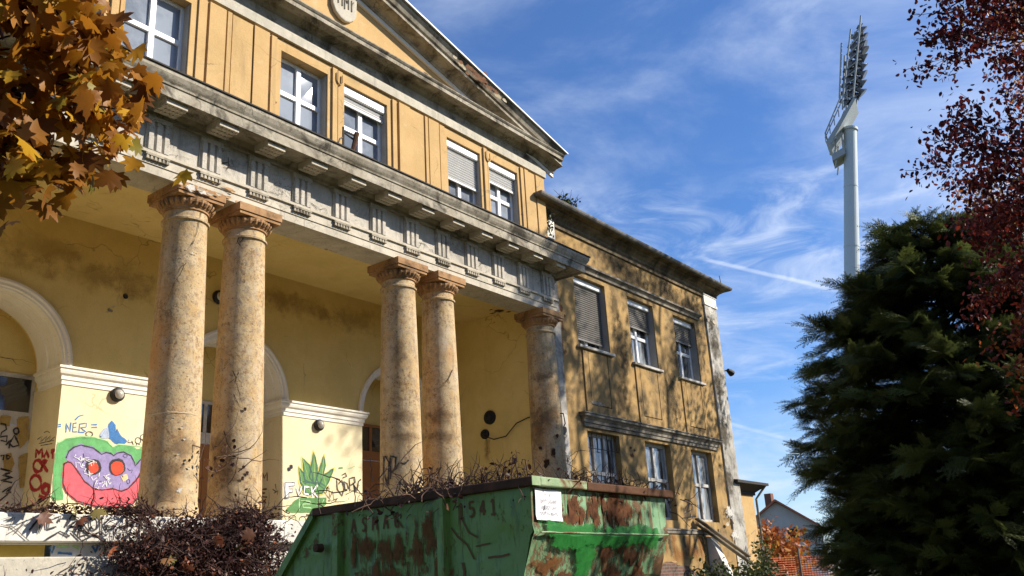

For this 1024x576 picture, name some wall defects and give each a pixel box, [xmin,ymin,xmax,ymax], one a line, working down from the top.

spalling [453,55,507,103]